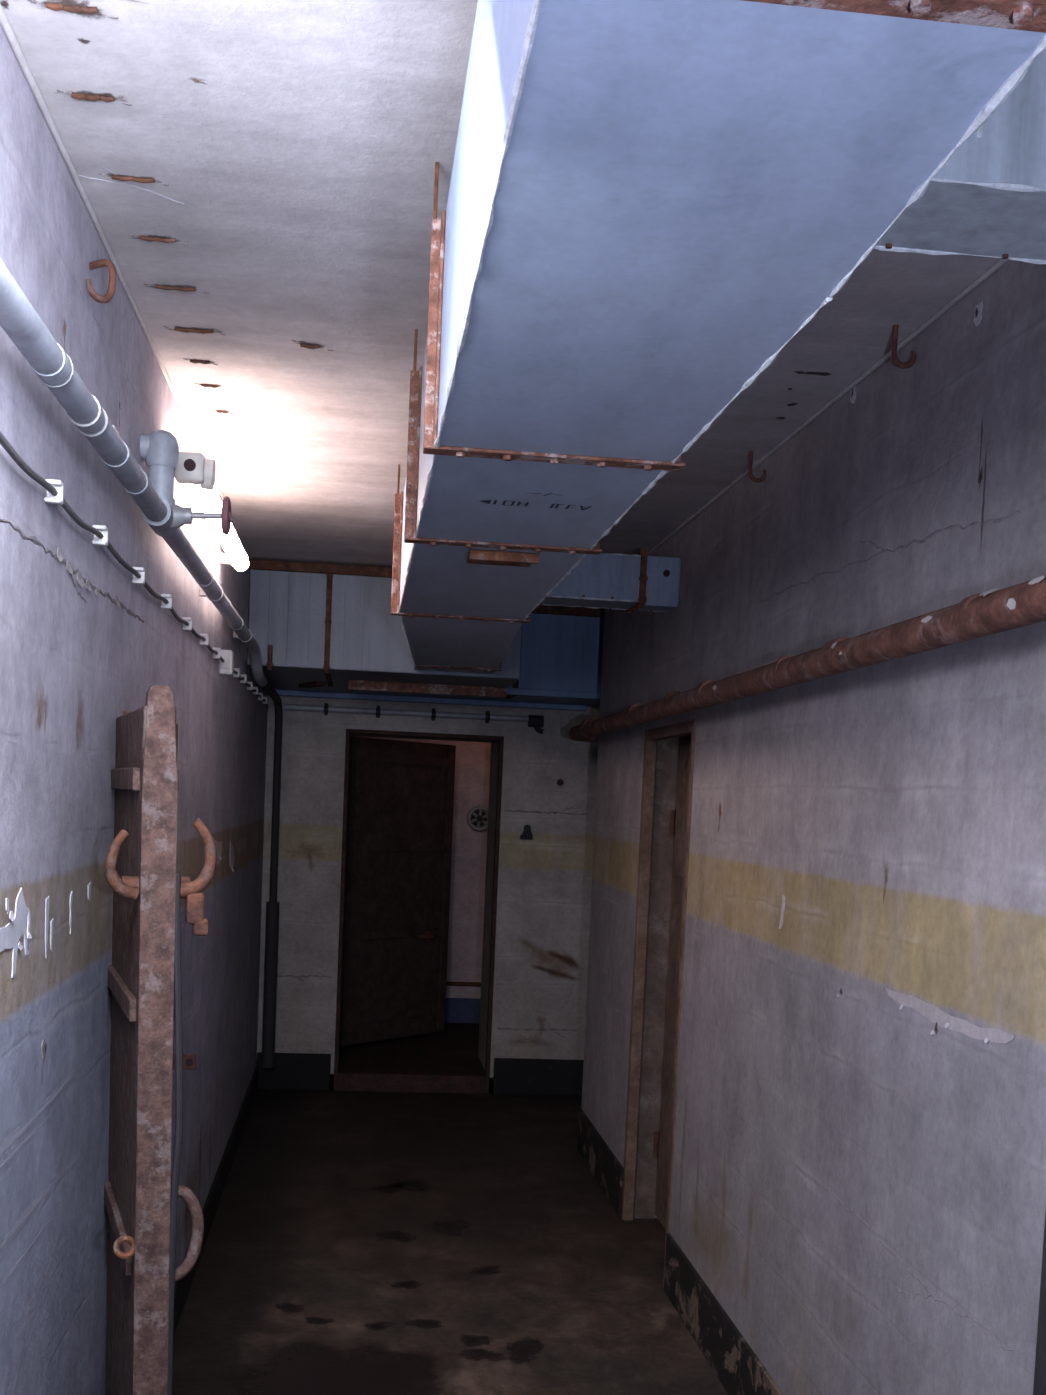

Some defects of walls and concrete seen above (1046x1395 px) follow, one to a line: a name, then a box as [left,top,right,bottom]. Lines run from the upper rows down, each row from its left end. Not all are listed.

crack [0,519,145,623]
peeling [0,882,91,978]
peeling [885,988,1015,1043]